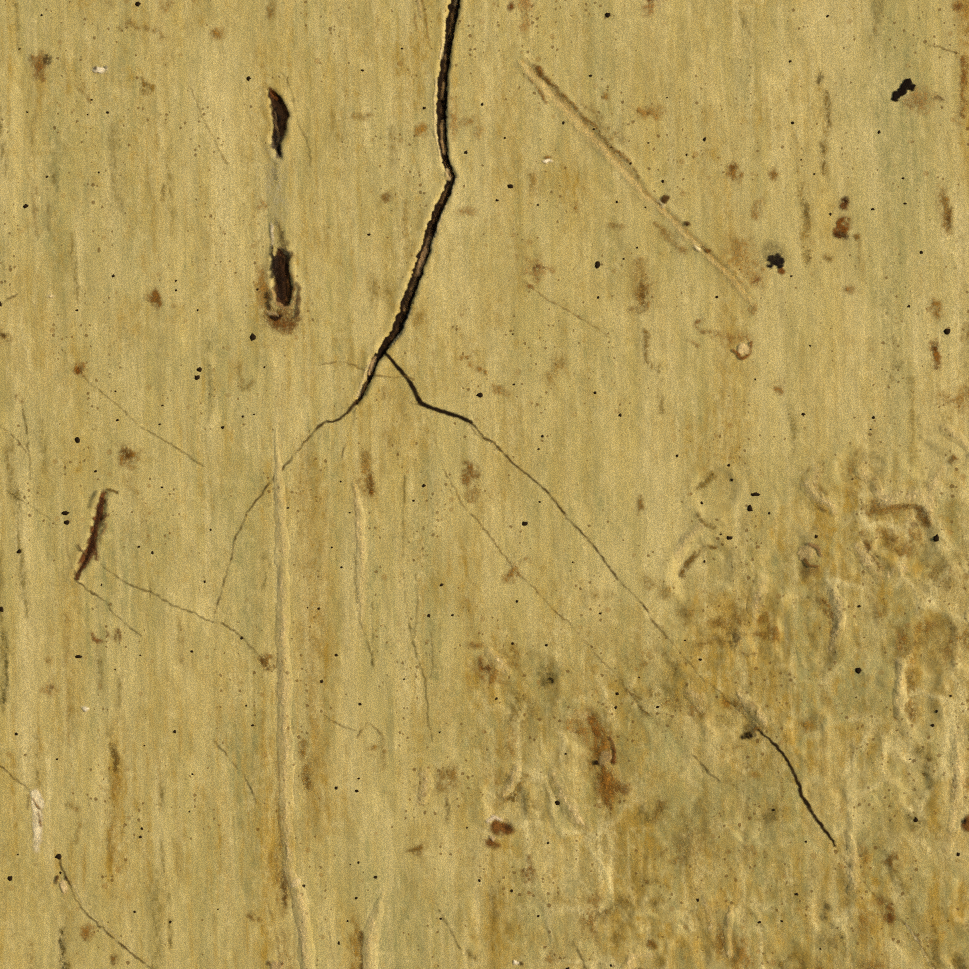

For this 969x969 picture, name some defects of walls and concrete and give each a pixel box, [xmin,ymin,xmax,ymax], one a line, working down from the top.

crack [304,0,618,579]
crack [759,730,836,847]